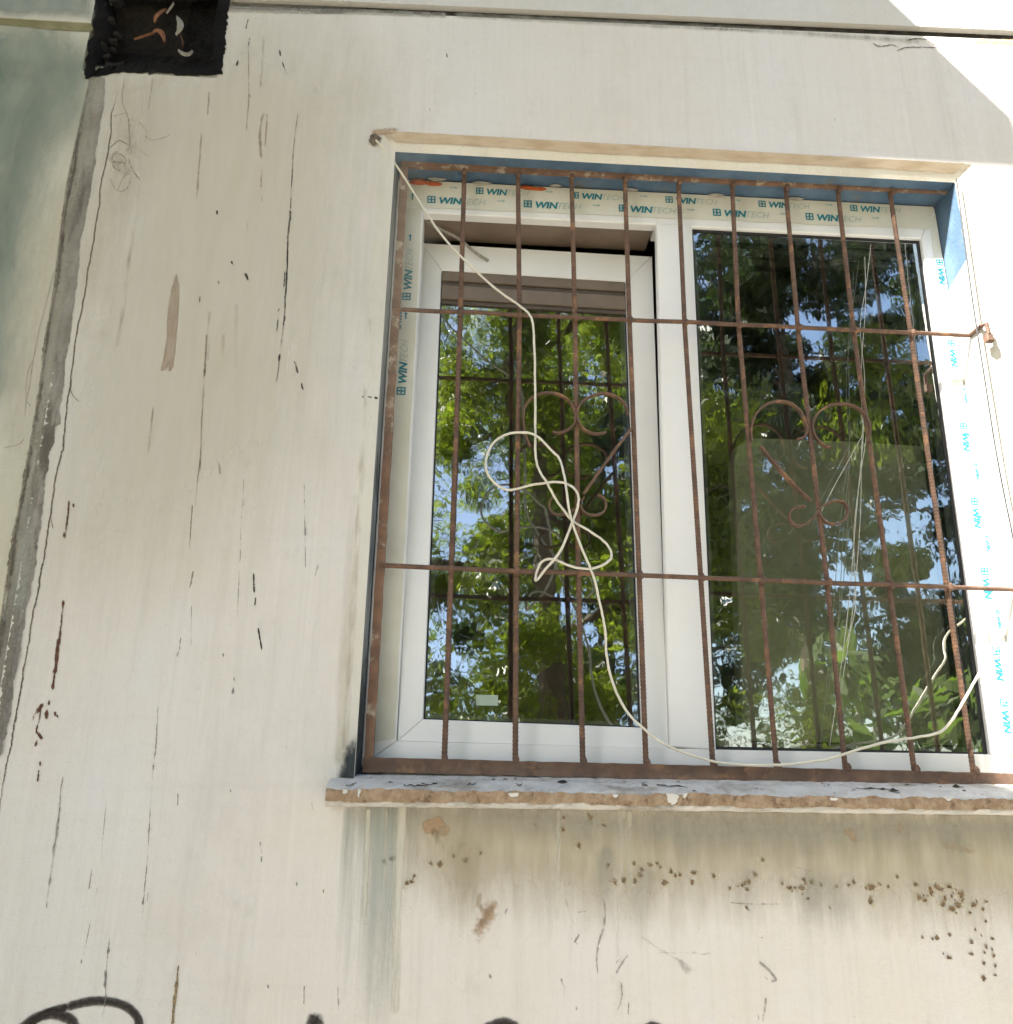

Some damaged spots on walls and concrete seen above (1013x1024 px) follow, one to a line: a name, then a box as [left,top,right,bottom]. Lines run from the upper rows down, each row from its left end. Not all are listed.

crack [875,38,938,51]
crack [0,79,169,804]
leakage [0,600,25,754]
leakage [51,601,65,690]
spalling [325,788,1013,832]
leakage [363,807,1013,1011]